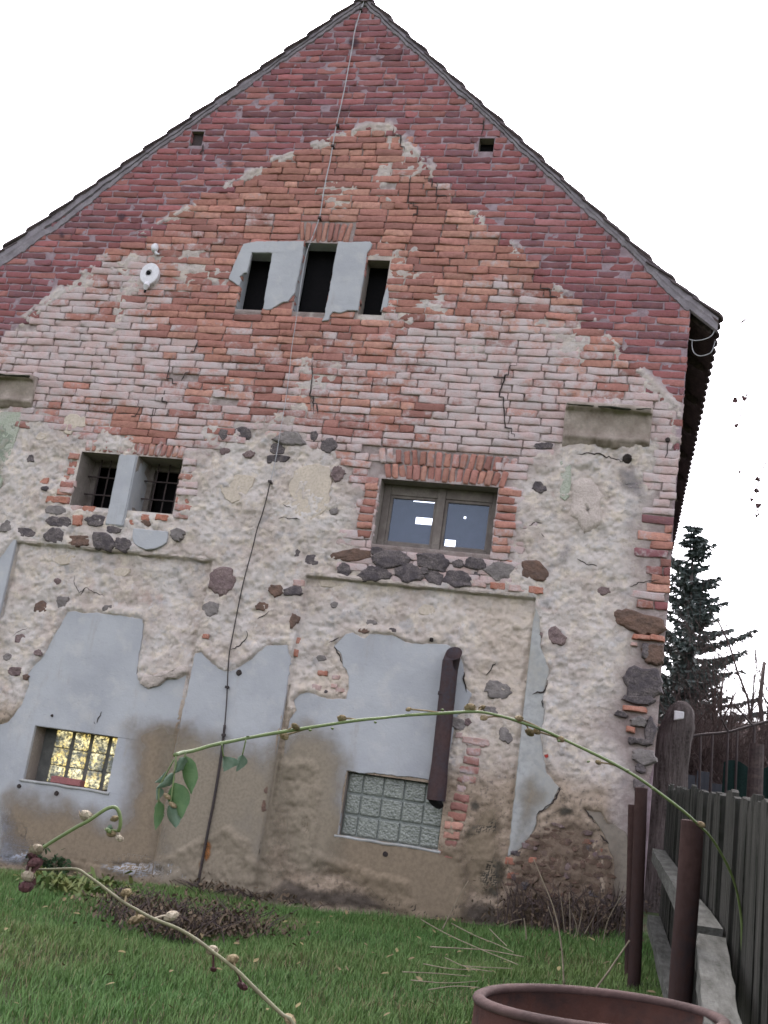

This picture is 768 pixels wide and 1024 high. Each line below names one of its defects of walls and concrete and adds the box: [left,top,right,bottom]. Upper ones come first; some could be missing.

crack [407,175,447,216]
peeling [229,241,304,311]
peeling [322,241,372,322]
peeling [381,288,389,313]
crack [493,365,517,437]
spalling [534,442,553,450]
spalling [532,481,547,494]
spalling [202,566,236,617]
spalling [294,549,318,565]
peeling [0,578,451,857]
peeling [450,608,627,930]
damp [1,725,503,925]